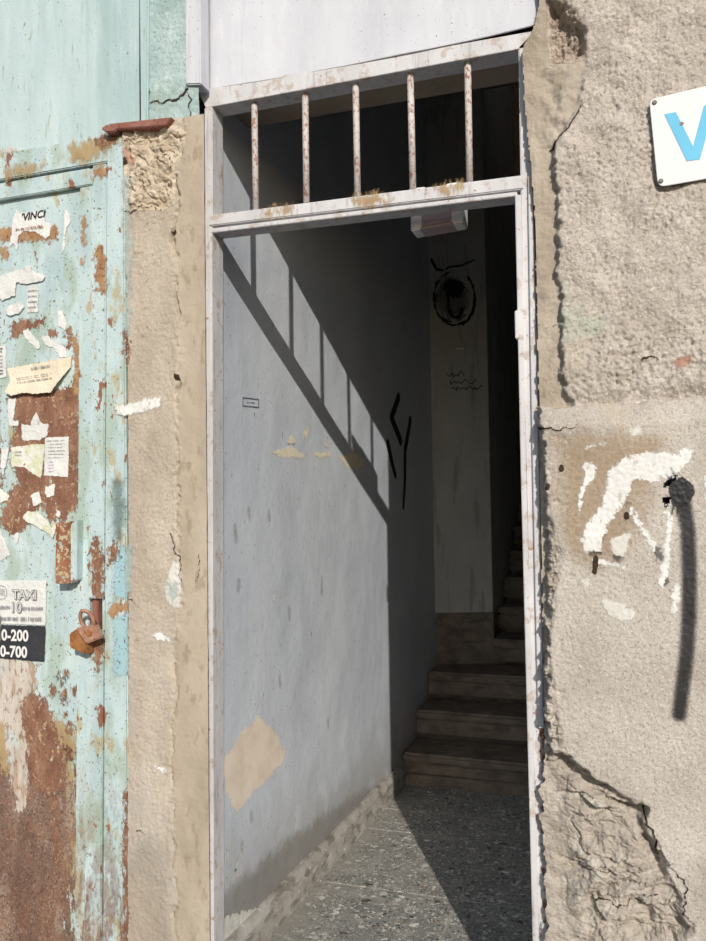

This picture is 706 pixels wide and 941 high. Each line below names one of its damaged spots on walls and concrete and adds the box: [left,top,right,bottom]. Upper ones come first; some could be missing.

crack [149,87,192,116]
corrosion [68,132,122,182]
spalling [122,123,187,214]
corrosion [78,215,108,295]
corrosion [0,316,79,539]
spalling [538,471,696,941]
corrosion [0,669,77,941]
peeling [224,715,285,812]
corrosion [535,720,549,937]